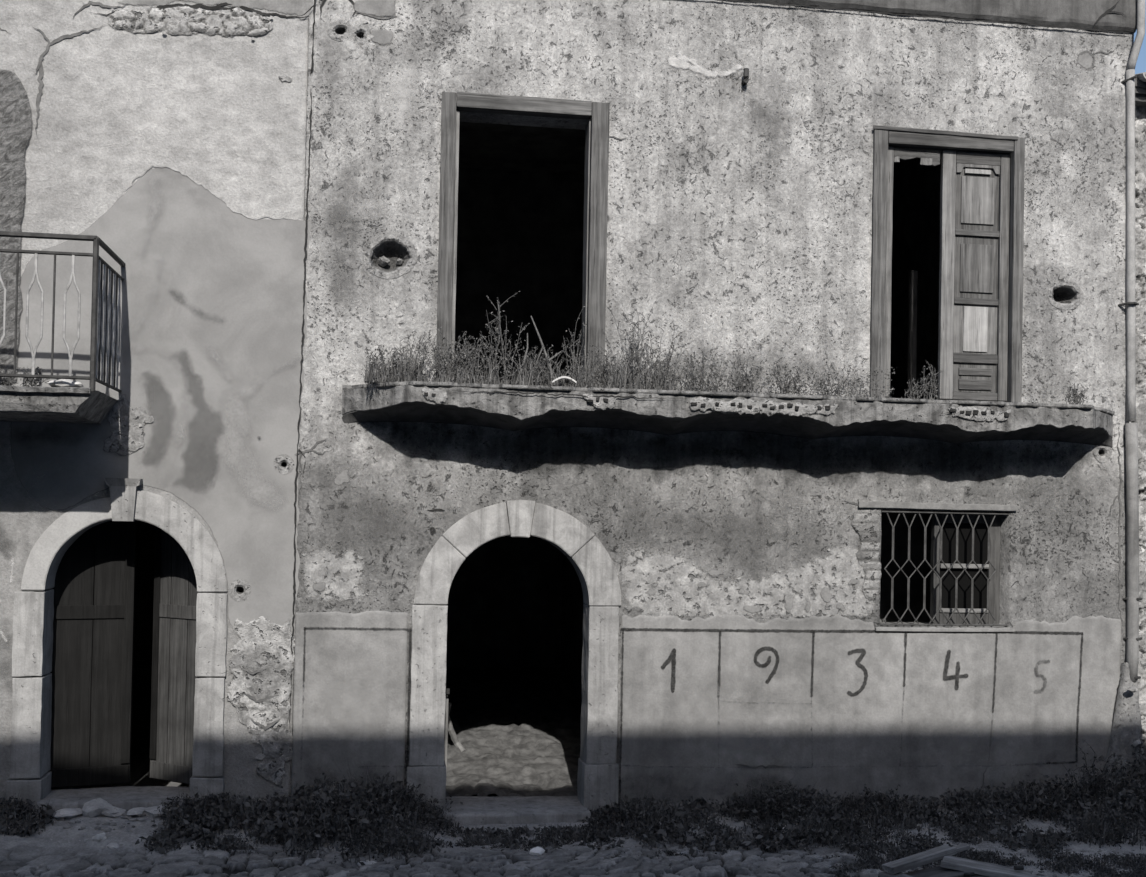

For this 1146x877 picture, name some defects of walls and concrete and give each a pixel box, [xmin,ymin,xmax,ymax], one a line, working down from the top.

crack [0,1,128,139]
spalling [108,0,313,40]
crack [727,0,1130,33]
damp [147,354,282,505]
crack [156,0,396,724]
crack [444,390,682,399]
flaking render [622,509,882,620]
crack [1110,426,1123,619]
spalling [227,616,295,786]